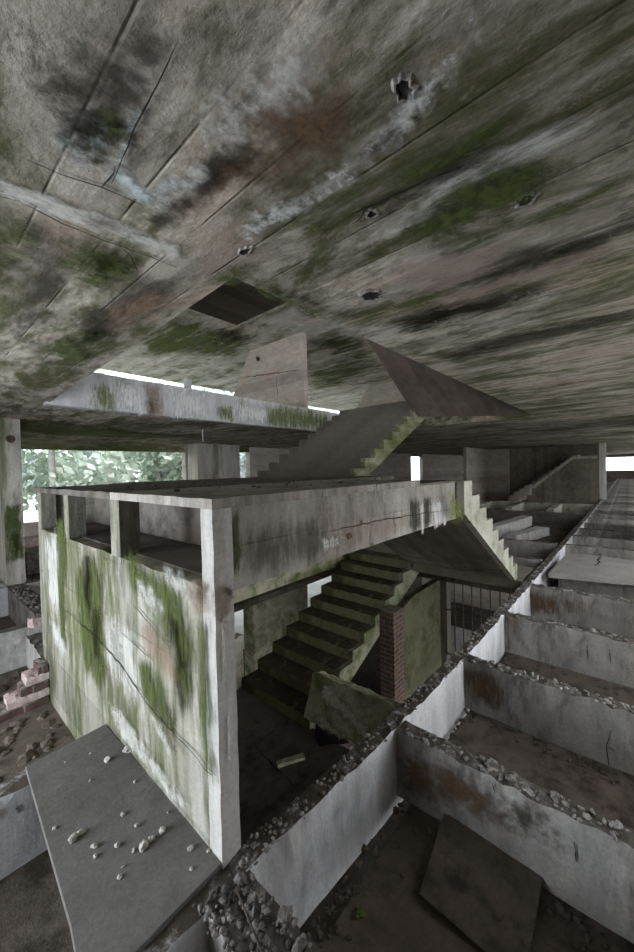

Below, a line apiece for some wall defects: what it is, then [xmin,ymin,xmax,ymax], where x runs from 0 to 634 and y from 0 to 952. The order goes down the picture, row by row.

leakage [34,35,163,164]
crack [28,43,177,205]
spalling [390,72,420,104]
leakage [442,178,620,257]
spalling [356,289,387,302]
leakage [349,217,634,333]
leakage [454,310,634,363]
rust [146,386,163,418]
crack [323,511,439,533]
leakage [410,498,446,533]
leakage [47,539,59,607]
leakage [85,556,173,746]